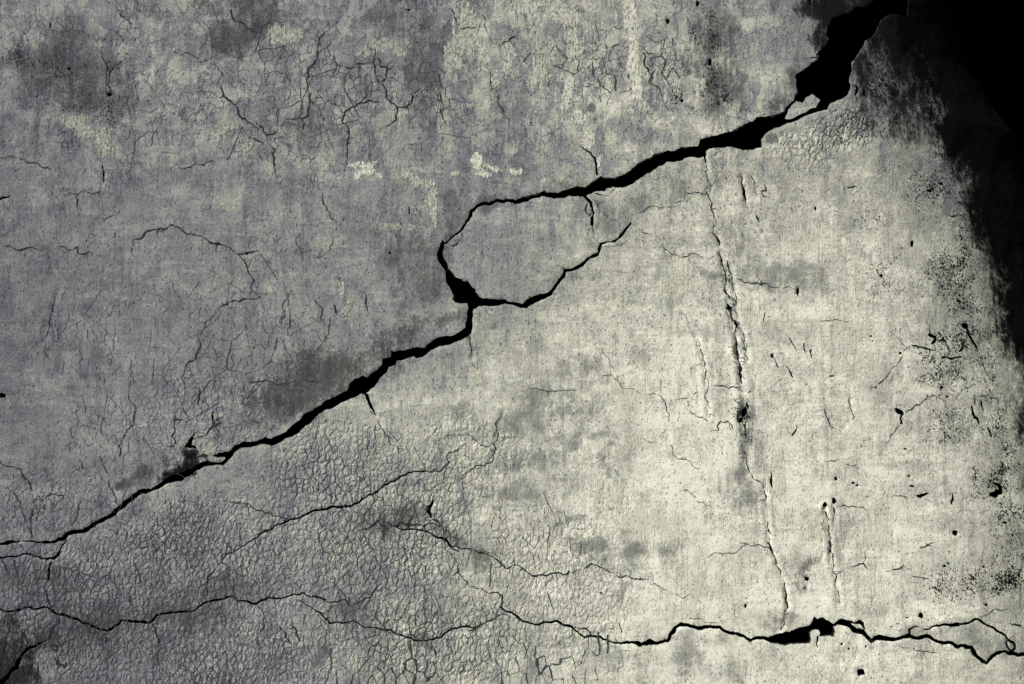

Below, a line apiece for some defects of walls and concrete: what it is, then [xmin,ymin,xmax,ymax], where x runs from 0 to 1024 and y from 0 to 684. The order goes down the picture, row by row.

crack [73,0,696,183]
crack [782,108,863,163]
crack [5,245,93,259]
crack [66,190,121,220]
crack [280,179,336,265]
crack [57,396,86,458]
crack [17,290,134,385]
crack [601,349,741,431]
crack [824,330,932,431]
leakage [824,17,1024,607]